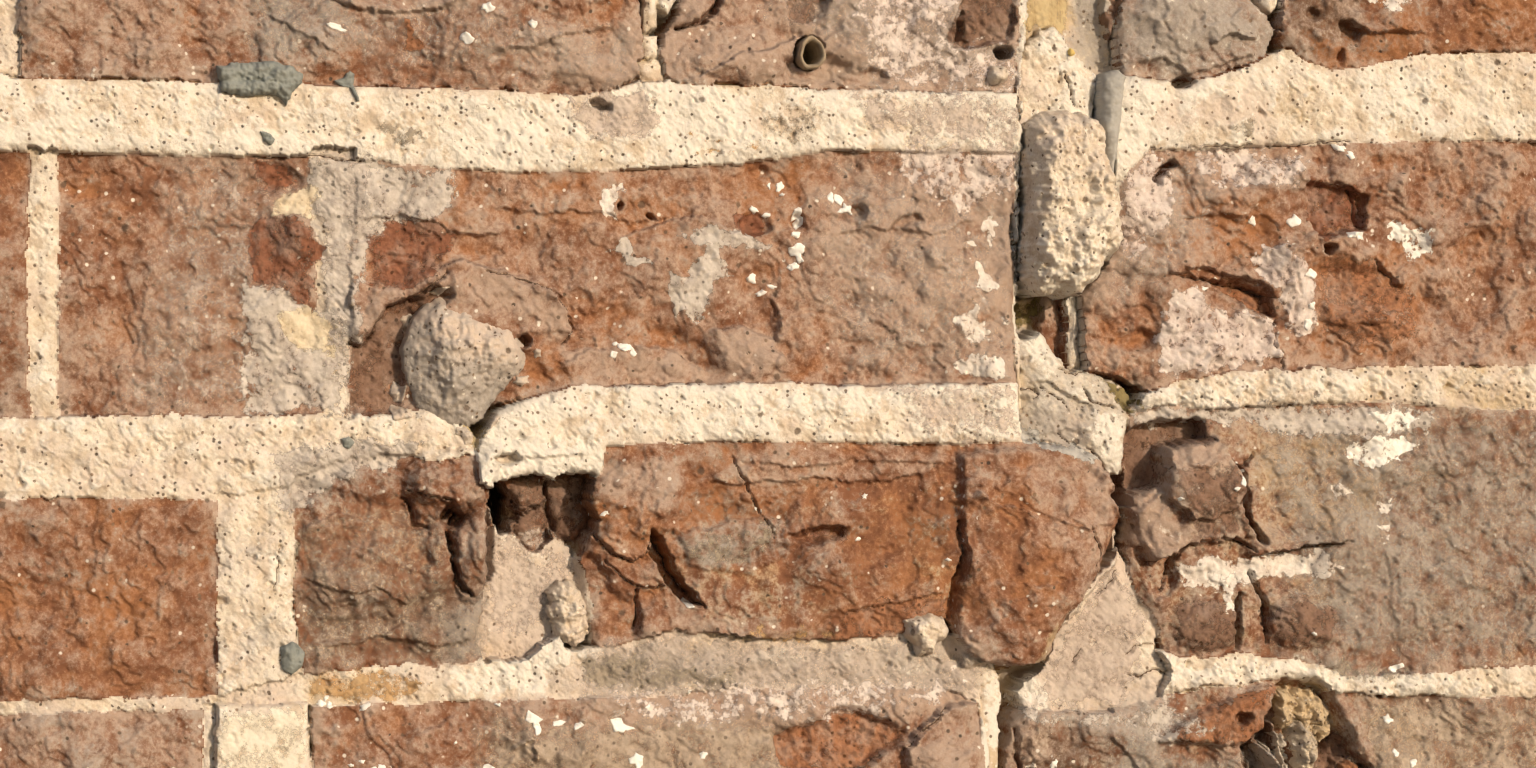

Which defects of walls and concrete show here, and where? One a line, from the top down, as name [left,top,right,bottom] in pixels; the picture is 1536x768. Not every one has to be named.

spalling [344,218,457,420]
spalling [486,475,598,545]
crack [733,460,775,539]
crack [1093,531,1348,631]